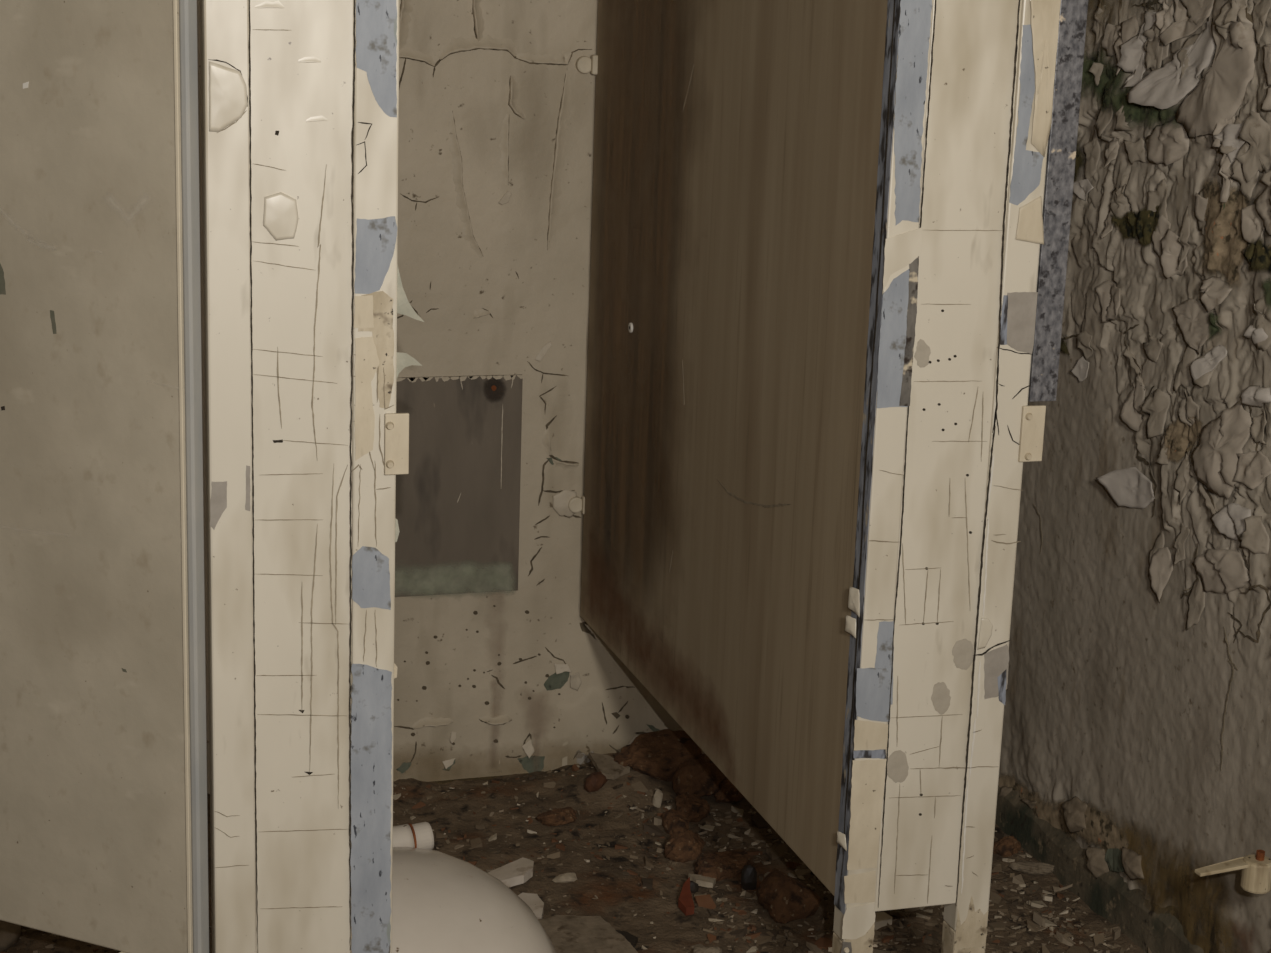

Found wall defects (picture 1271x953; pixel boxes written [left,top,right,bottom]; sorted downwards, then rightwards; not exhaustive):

peeling [356,0,397,117]
crack [399,5,592,255]
peeling [1009,0,1061,245]
water stain [1081,54,1177,125]
peeling [1073,0,1271,285]
peeling [352,546,391,610]
peeling [354,216,424,461]
crack [527,361,581,586]
peeling [1096,467,1155,509]
peeling [1120,298,1227,505]
peeling [1148,503,1270,631]
peeling [350,663,417,953]